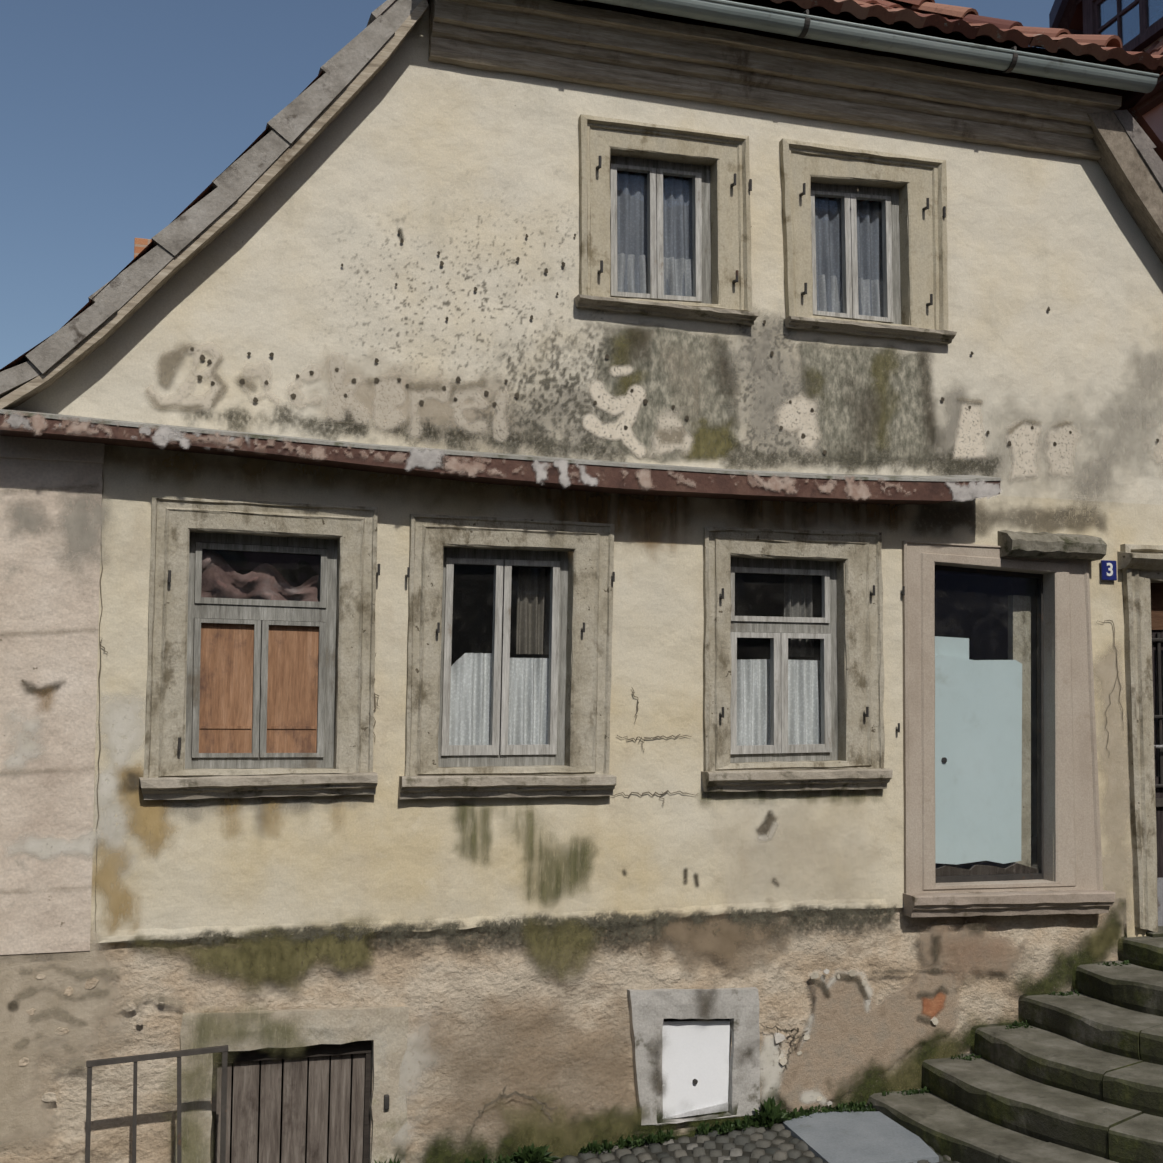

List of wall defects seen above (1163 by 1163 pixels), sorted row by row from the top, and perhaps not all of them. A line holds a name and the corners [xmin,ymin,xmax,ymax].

peeling [1,414,125,436]
mould [273,407,367,439]
water stain [390,333,625,461]
water stain [729,321,999,476]
peeling [139,426,600,487]
crack [617,688,692,749]
water stain [120,766,184,851]
crack [611,790,697,804]
spalling [757,811,777,841]
water stain [94,853,133,928]
mould [166,906,896,966]
flaking render [760,920,1028,1112]